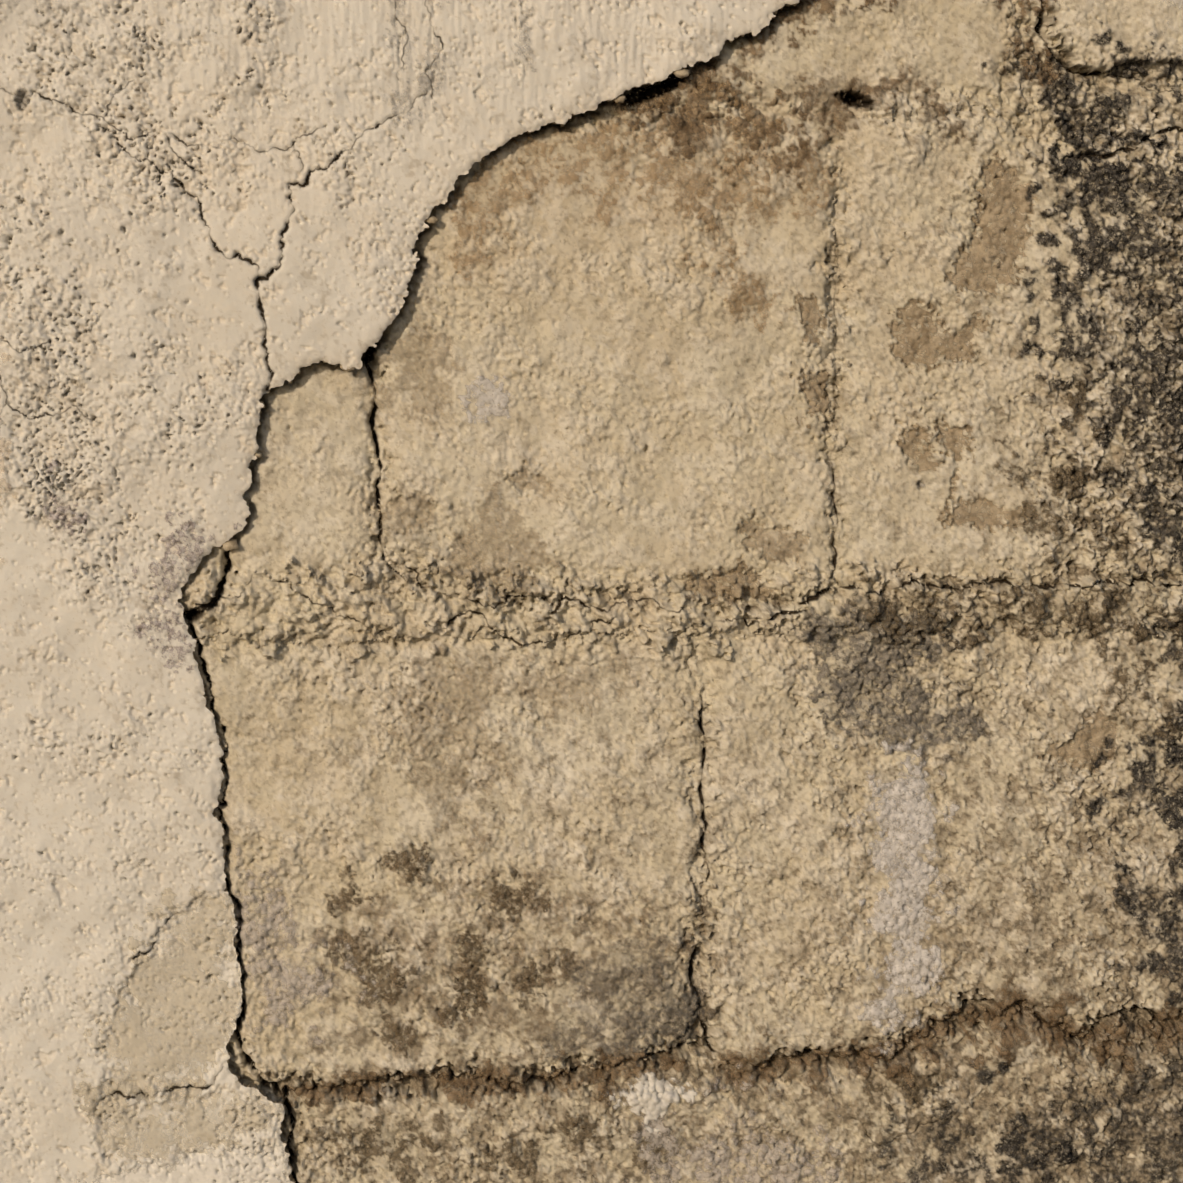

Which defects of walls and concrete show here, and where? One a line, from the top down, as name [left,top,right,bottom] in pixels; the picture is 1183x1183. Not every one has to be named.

leakage [617,0,977,189]
crack [4,81,341,391]
spalling [887,299,989,374]
spalling [944,153,1036,303]
leakage [132,512,216,673]
crack [365,357,423,588]
crack [429,477,1182,646]
leakage [692,0,1183,1183]
spalling [896,419,1038,533]
flaking render [212,733,296,1183]
crack [186,551,385,1183]
leakage [233,859,845,1183]